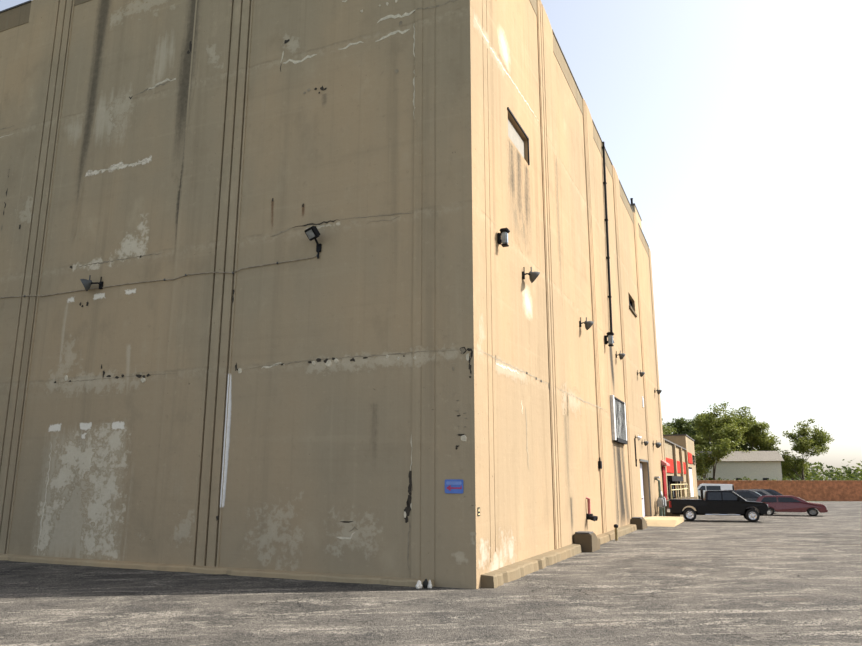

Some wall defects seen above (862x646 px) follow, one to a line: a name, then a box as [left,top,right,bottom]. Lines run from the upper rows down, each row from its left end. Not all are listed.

peeling [109,0,176,31]
spalling [279,28,317,71]
crack [472,7,536,117]
leakage [71,0,114,244]
leakage [171,0,202,261]
peeling [72,213,150,273]
crack [270,212,417,237]
leakage [506,136,533,255]
peeling [29,417,146,561]
peeling [323,505,383,562]
crack [404,435,412,568]